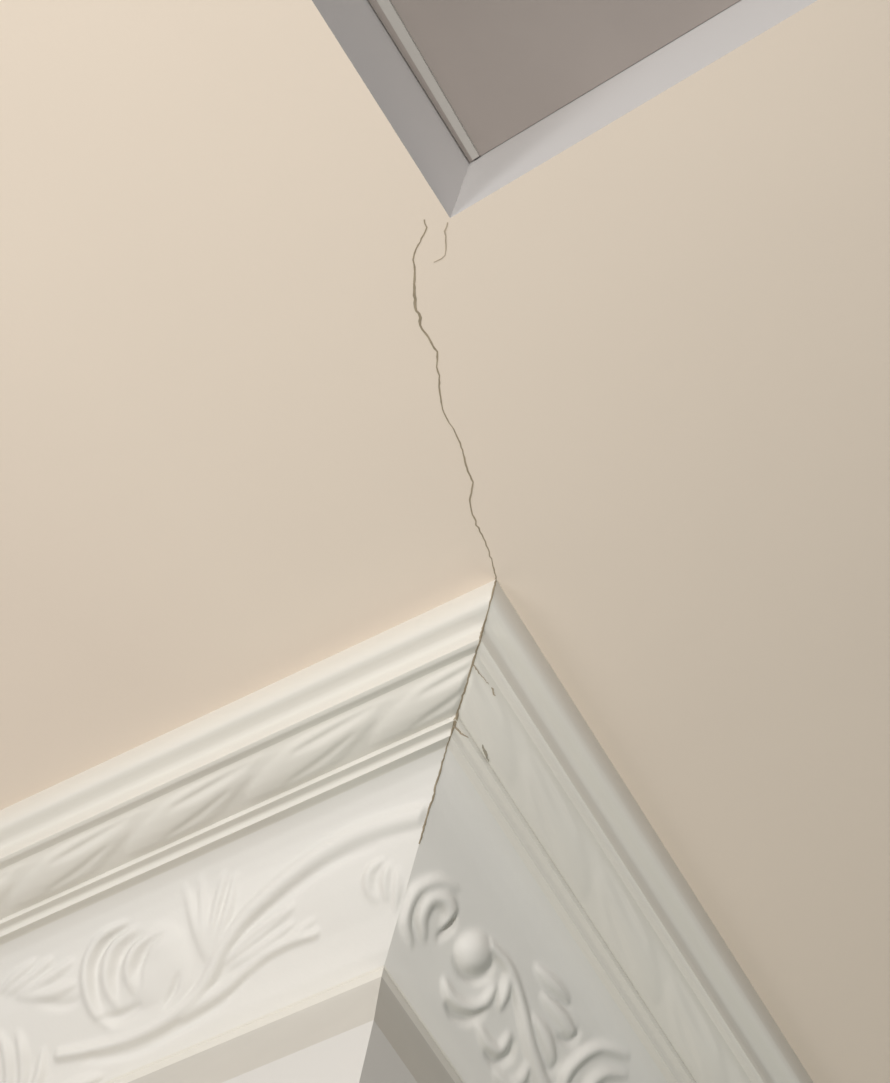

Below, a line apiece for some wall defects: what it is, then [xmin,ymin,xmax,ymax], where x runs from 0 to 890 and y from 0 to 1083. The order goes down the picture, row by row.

crack [412,219,497,844]